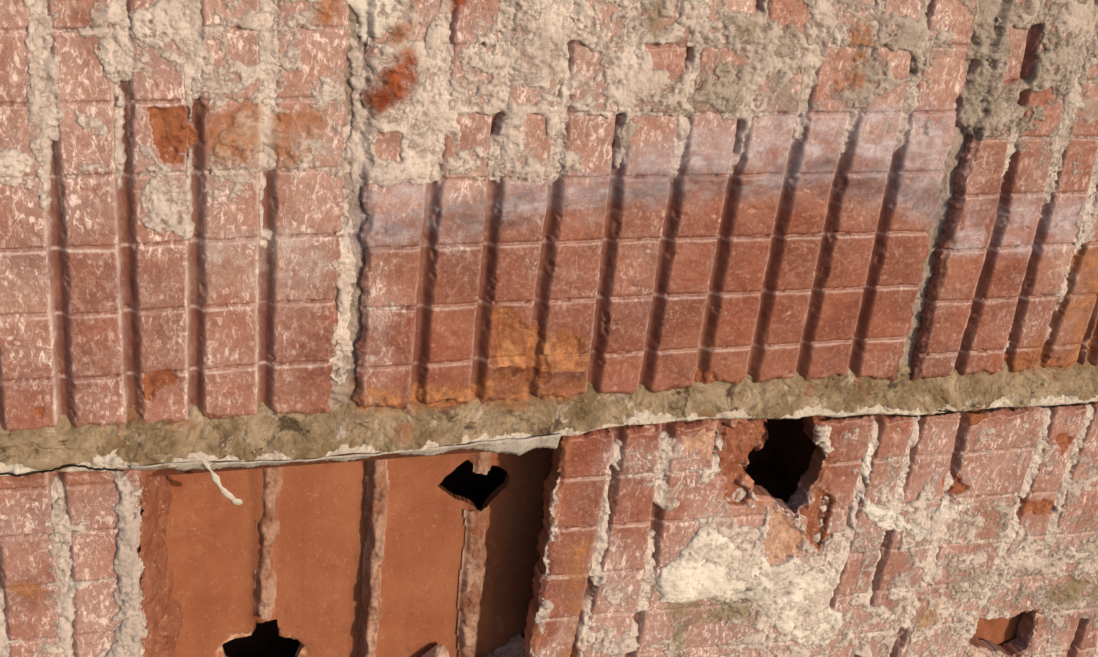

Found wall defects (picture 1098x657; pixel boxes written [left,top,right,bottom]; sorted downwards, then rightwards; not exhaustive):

crack [821,402,1094,421]
hole [745,417,816,503]
crack [0,464,124,477]